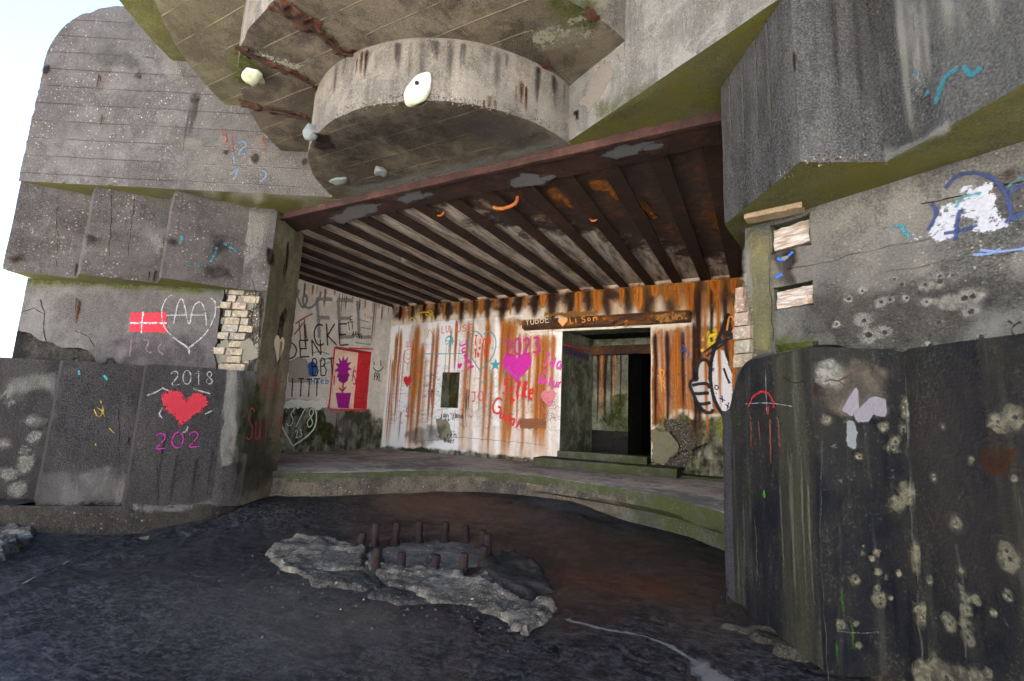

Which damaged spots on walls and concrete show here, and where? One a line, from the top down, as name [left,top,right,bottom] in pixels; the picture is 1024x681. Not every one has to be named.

corrosion [589,180,620,201]
crack [23,300,46,341]
spalling [210,289,261,465]
corrosion [304,278,744,448]
spalling [651,419,697,468]
peeling [814,359,906,460]
spalling [832,272,955,346]
crack [769,238,1020,342]
water stain [920,383,962,573]
water stain [779,460,814,598]
spalling [941,567,998,647]
water stain [928,652,990,681]